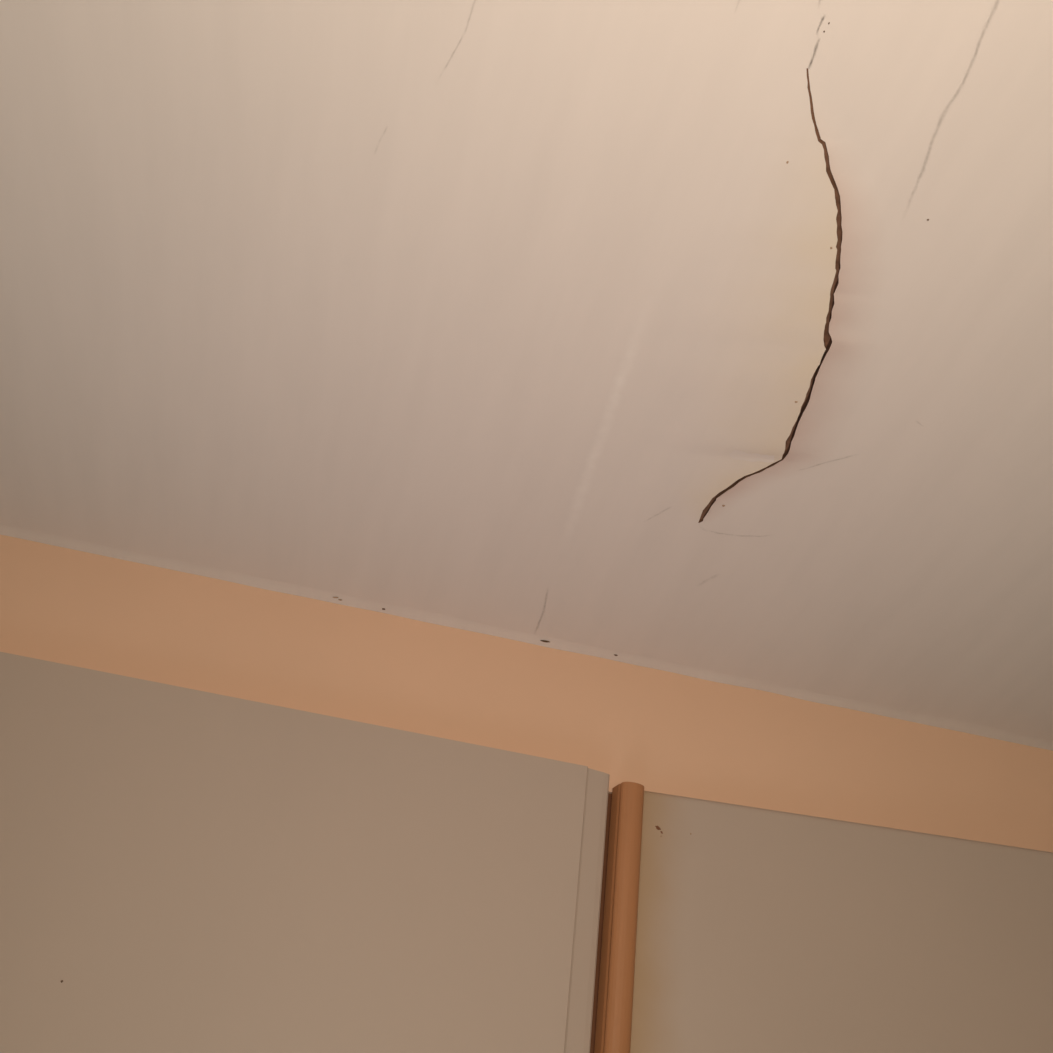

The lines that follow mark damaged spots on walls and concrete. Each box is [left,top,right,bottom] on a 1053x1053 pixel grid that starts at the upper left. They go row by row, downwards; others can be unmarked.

crack [698,68,842,523]